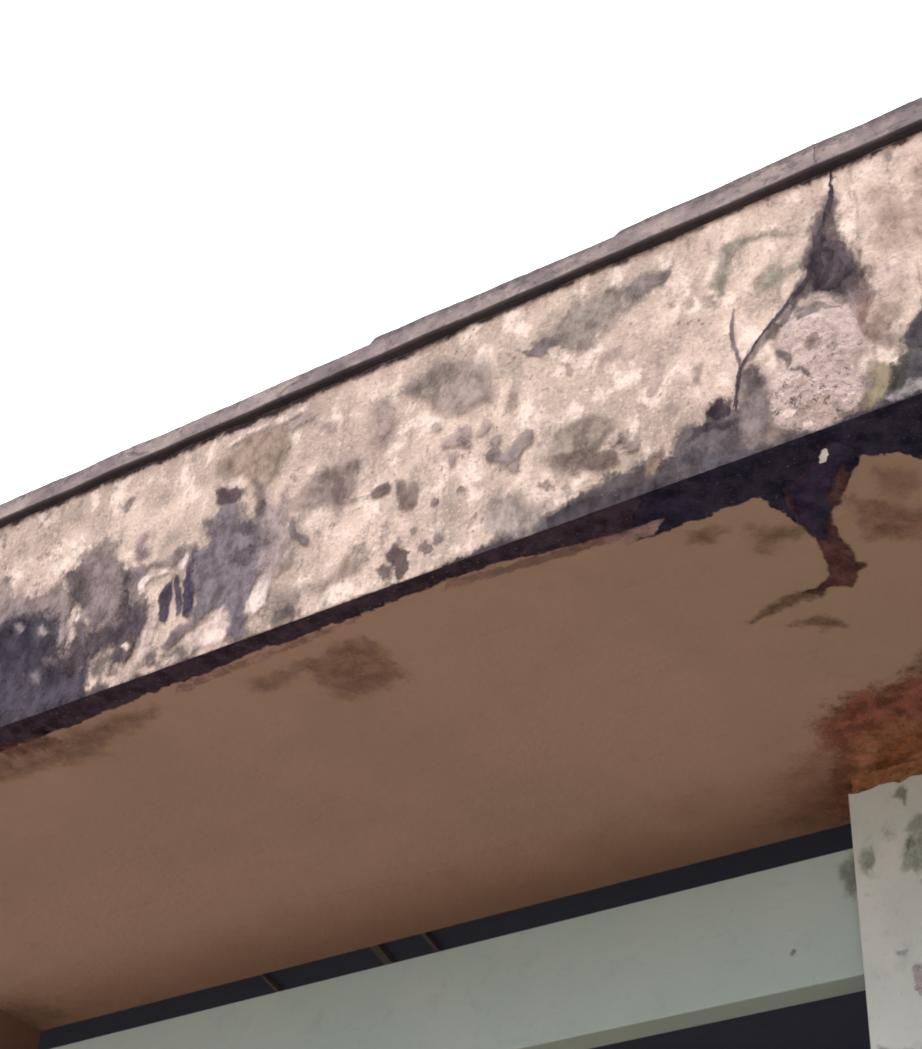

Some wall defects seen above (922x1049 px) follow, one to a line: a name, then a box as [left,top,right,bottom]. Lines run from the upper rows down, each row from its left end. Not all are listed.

crack [729,144,857,412]
leakage [795,135,912,187]
leakage [0,195,922,777]
corrosion [818,660,922,824]